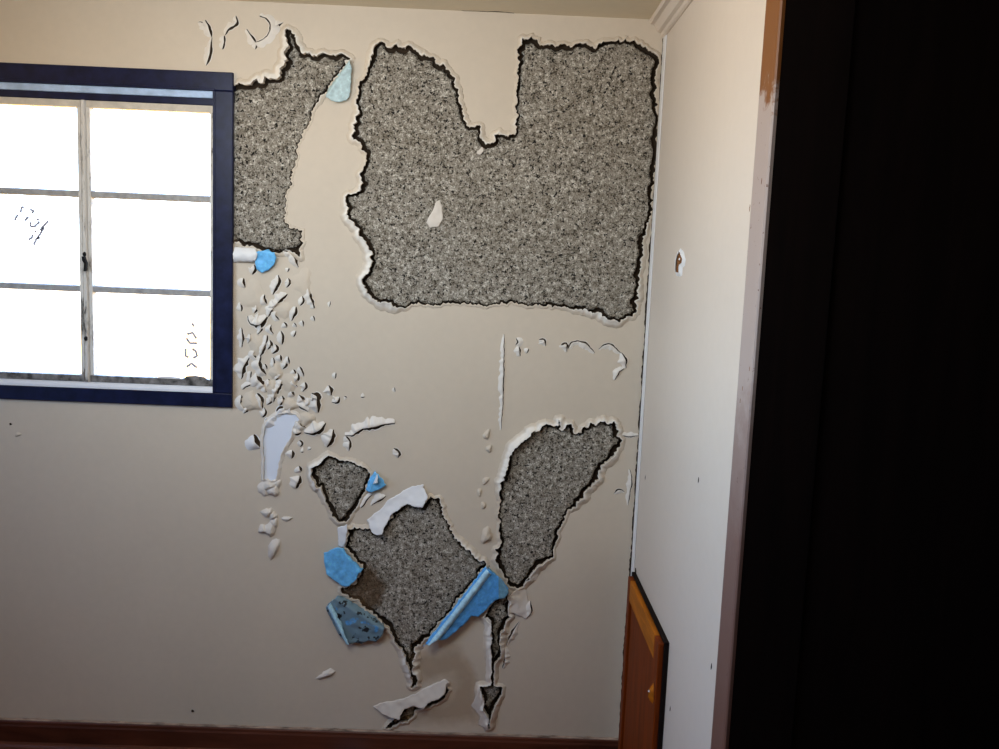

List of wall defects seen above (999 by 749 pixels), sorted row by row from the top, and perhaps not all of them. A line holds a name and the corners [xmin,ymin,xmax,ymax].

peeling [233,24,662,732]
spalling [675,248,686,277]